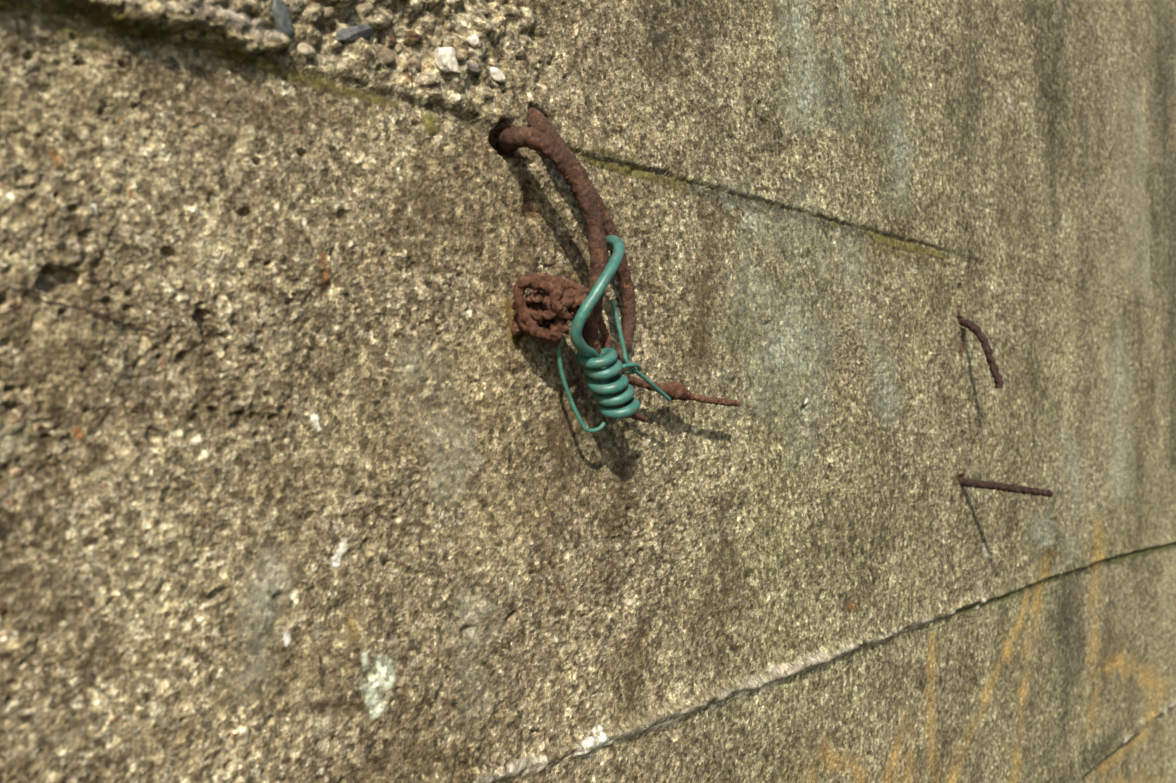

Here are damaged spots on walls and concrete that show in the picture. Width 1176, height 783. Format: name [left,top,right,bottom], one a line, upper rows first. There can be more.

spalling [98,0,541,102]